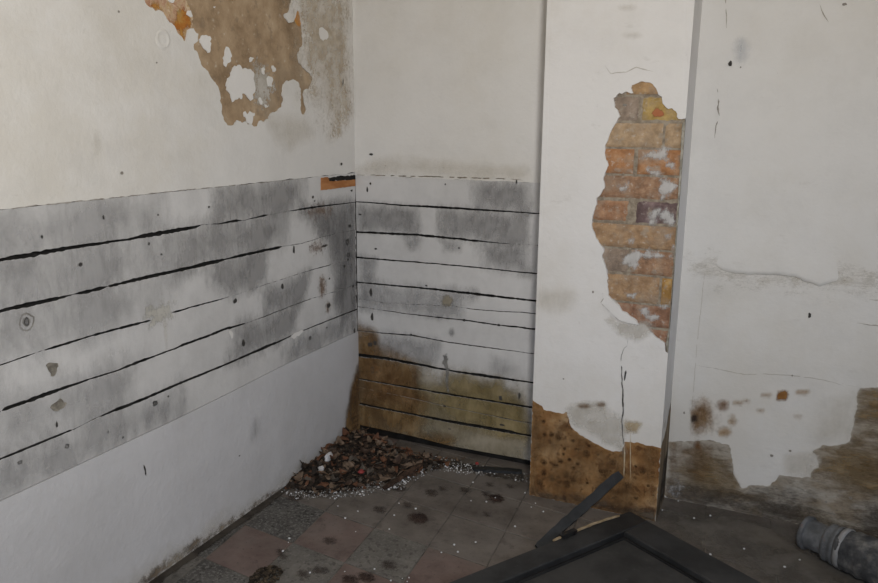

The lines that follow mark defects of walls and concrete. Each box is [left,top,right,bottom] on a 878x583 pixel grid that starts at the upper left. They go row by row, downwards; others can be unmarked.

peeling [145,0,350,135]
damp [73,203,115,240]
damp [71,248,122,291]
crack [12,176,317,209]
damp [181,181,297,292]
damp [229,273,307,358]
damp [293,206,418,356]
damp [439,184,530,265]
spalling [592,82,686,353]
damp [388,340,529,458]
crack [621,341,631,478]
peeling [529,387,878,539]